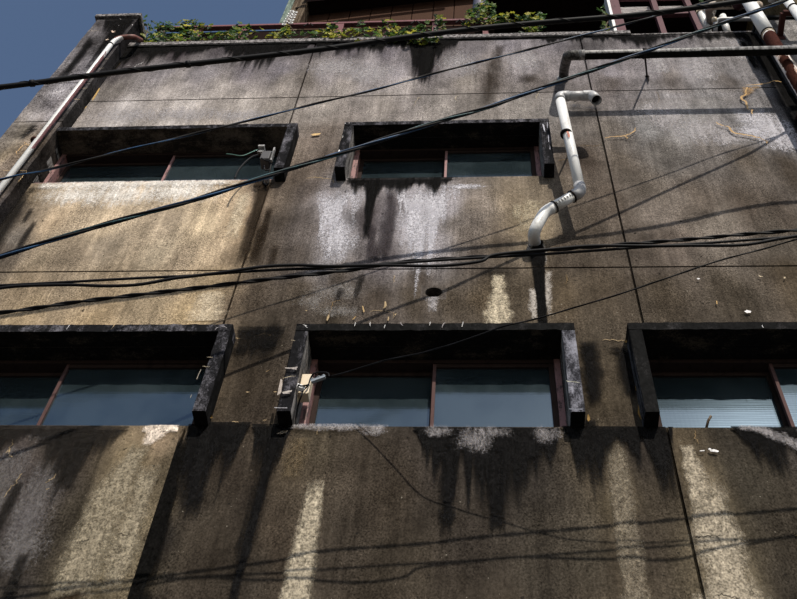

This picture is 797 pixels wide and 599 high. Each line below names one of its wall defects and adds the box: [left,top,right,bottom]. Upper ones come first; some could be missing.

leakage [112,40,459,81]
leakage [542,32,797,150]
crack [716,122,767,143]
crack [740,80,780,114]
leakage [319,177,480,290]
leakage [483,267,515,323]
leakage [528,240,551,323]
leakage [580,342,604,402]
leakage [0,425,130,496]
leakage [731,426,797,473]
leakage [56,422,304,599]
leakage [413,419,761,599]